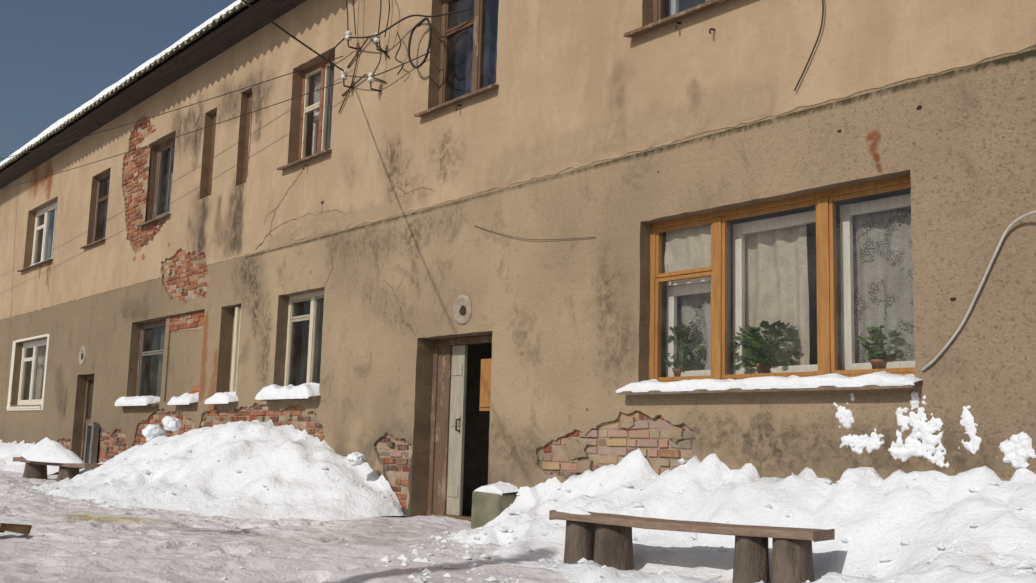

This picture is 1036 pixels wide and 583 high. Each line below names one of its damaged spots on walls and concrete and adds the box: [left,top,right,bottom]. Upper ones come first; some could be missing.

flaking render [123,116,167,261]
rust [867,132,881,172]
flaking render [162,242,209,332]
flaking render [97,403,324,463]
flaking render [376,434,412,509]
flaking render [538,410,697,479]